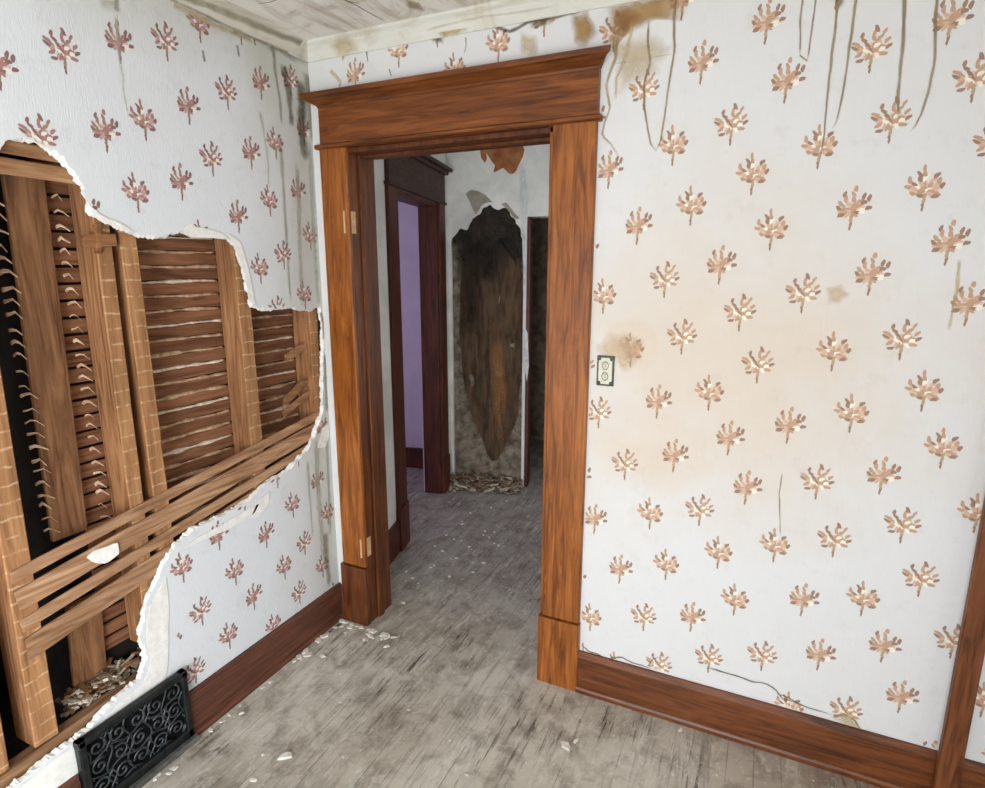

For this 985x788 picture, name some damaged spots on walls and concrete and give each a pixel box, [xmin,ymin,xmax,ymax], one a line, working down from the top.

water stain [497,14,593,41]
water stain [606,0,676,145]
water stain [799,0,816,61]
water stain [897,0,906,111]
water stain [916,0,939,124]
water stain [273,50,313,227]
flaking render [450,146,534,484]
spalling [0,176,113,580]
spalling [46,636,85,726]
spalling [38,557,119,627]
flaking render [100,577,169,724]
flaking render [19,745,78,788]